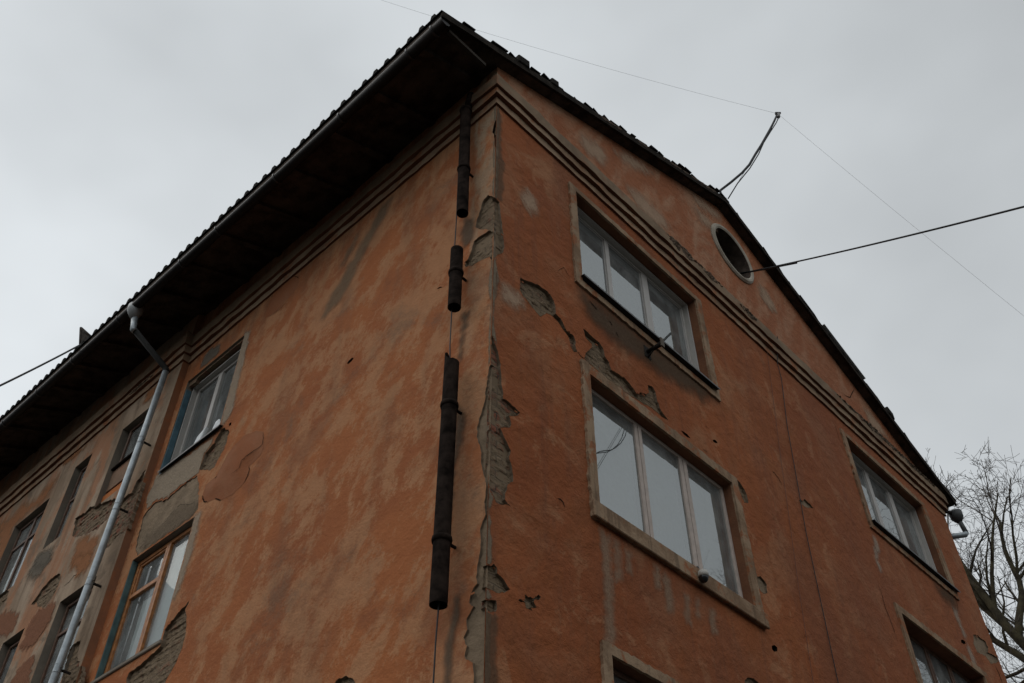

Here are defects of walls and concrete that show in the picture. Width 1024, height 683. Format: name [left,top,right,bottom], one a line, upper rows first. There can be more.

spalling [463,107,520,683]